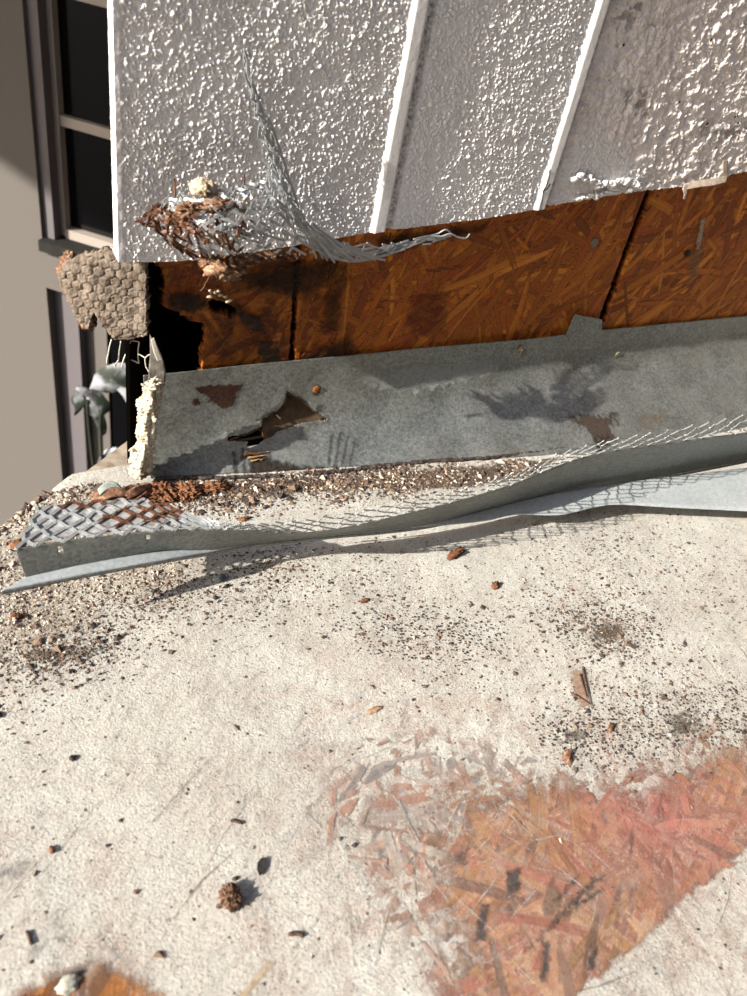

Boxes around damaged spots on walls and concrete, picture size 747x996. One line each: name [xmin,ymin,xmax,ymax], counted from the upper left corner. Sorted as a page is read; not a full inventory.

peeling [682,160,729,200]
spalling [569,172,647,304]
corrosion [192,384,243,409]
peeling [262,391,327,440]